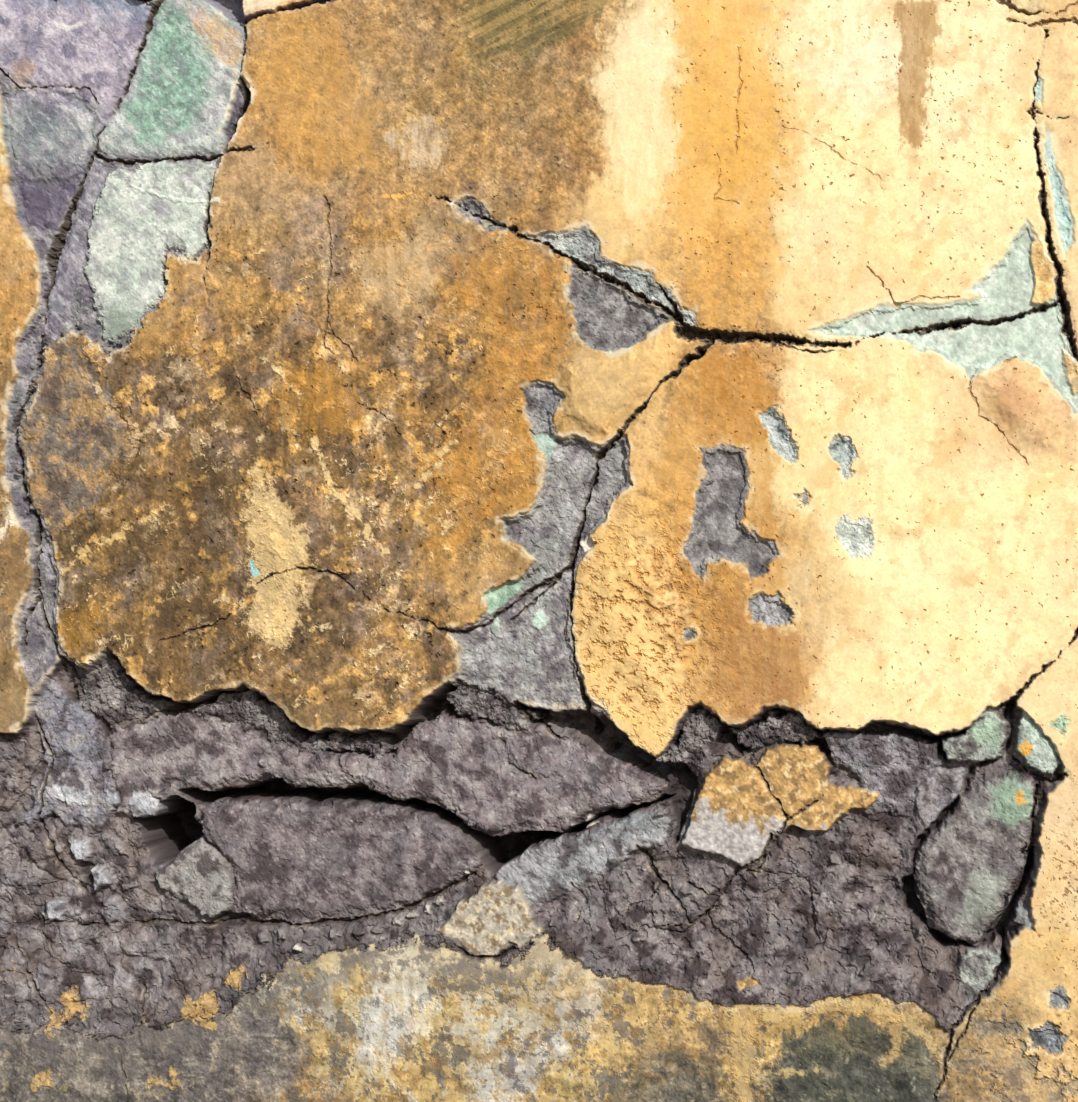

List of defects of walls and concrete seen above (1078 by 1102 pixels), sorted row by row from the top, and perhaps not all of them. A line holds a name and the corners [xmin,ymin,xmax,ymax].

peeling [1035,76,1077,257]
spalling [0,0,247,696]
crack [0,0,339,698]
spalling [451,379,634,630]
crack [256,0,1078,738]
spalling [682,444,796,630]
peeling [757,404,800,466]
peeling [828,433,860,482]
peeling [832,511,878,561]
peeling [806,218,1078,416]
spalling [0,573,1074,1042]
crack [931,962,1008,1102]